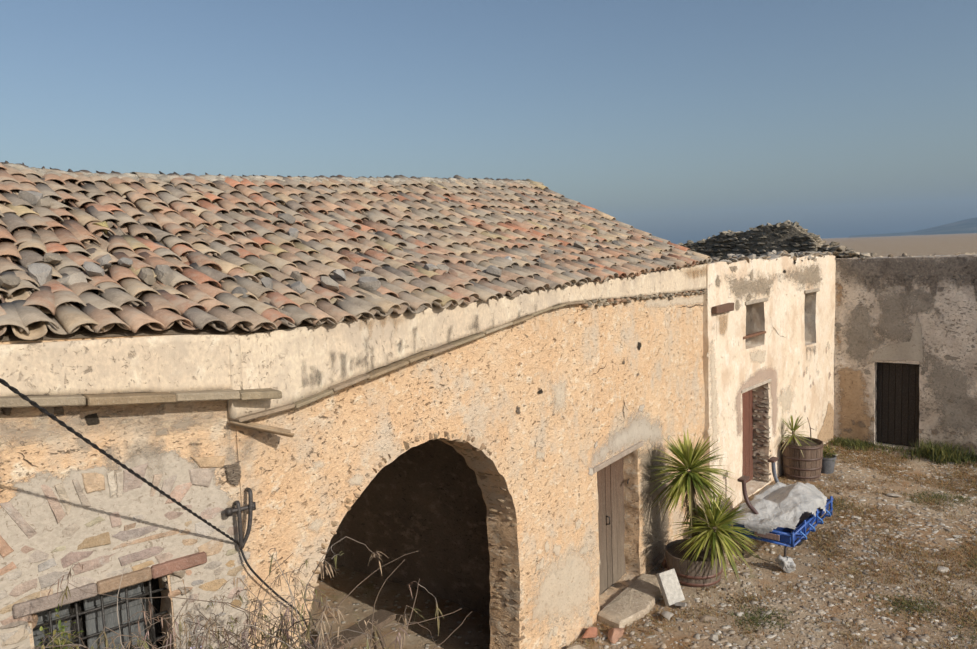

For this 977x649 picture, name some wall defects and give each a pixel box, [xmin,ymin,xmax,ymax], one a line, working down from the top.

flaking render [798,275,941,442]
flaking render [921,350,977,435]
flaking render [0,450,251,649]